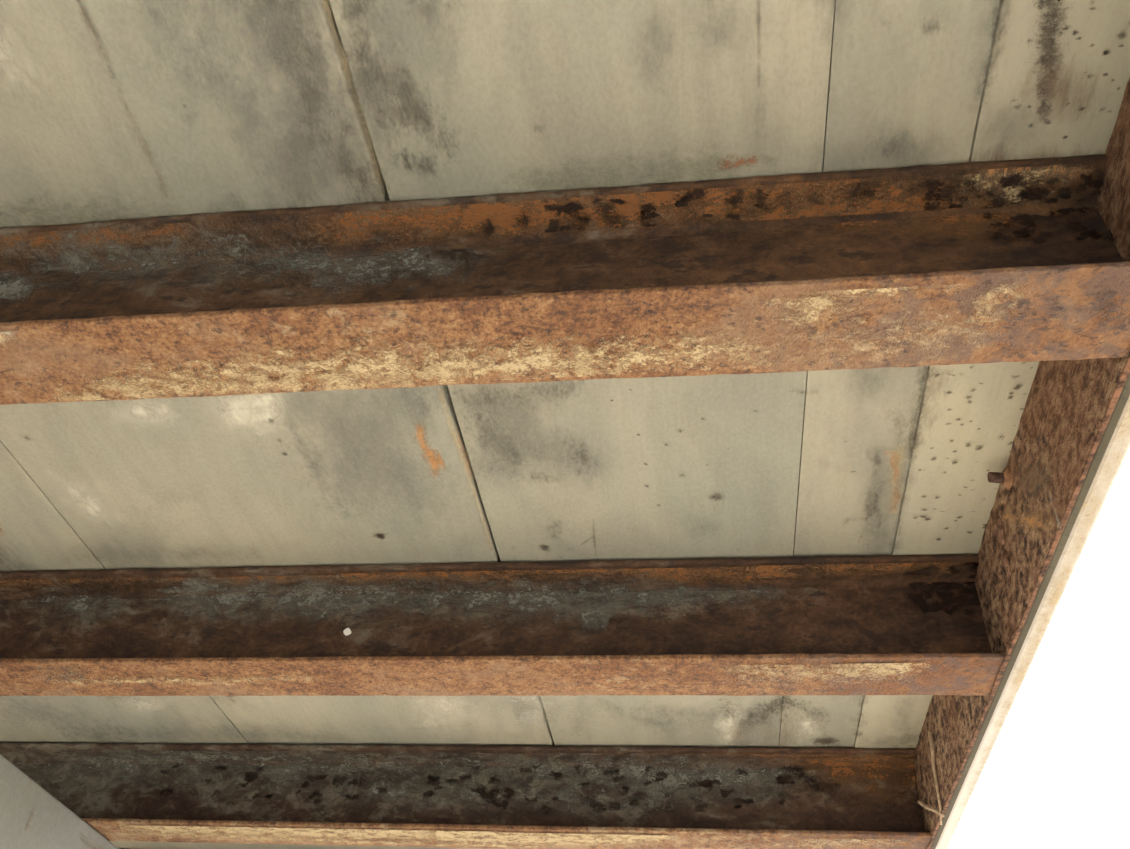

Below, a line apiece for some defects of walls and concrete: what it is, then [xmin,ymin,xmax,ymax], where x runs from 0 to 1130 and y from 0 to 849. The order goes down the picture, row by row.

leakage [1036,0,1069,121]
corrosion [313,165,1114,246]
corrosion [1003,282,1128,358]
corrosion [416,425,444,474]
corrosion [204,565,800,585]
corrosion [816,562,980,617]
corrosion [239,766,273,799]
corrosion [296,774,387,804]
corrosion [423,767,559,813]
corrosion [574,765,640,812]
corrosion [640,765,841,812]
corrosion [917,730,944,825]